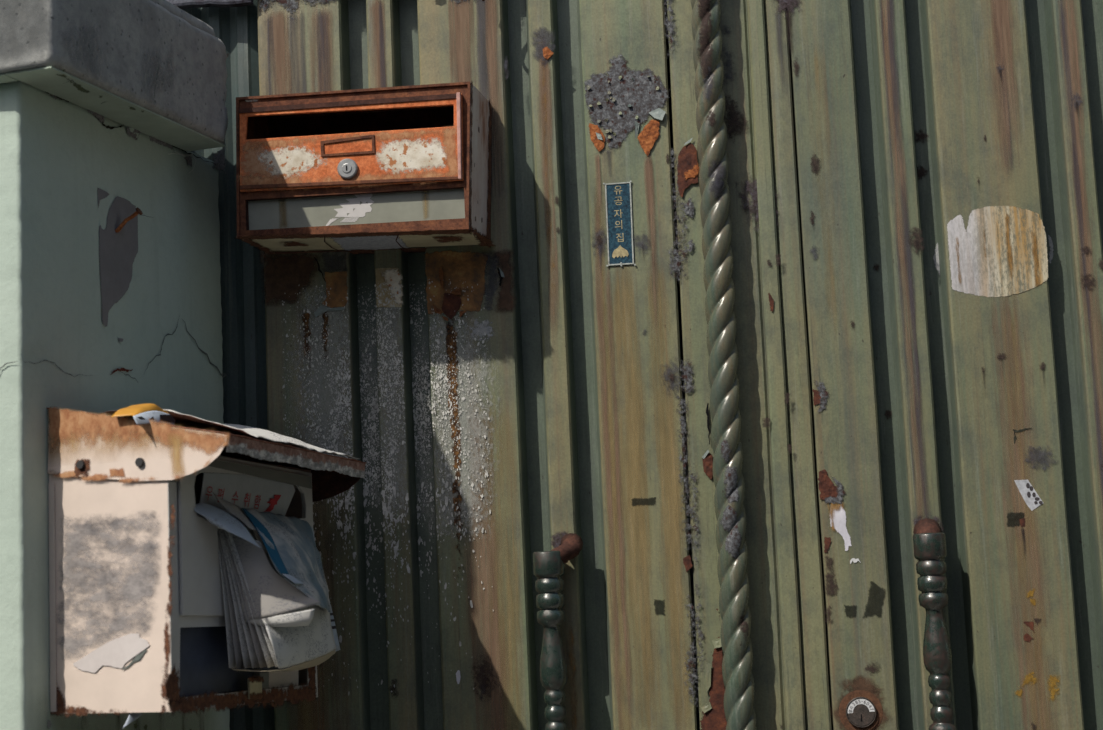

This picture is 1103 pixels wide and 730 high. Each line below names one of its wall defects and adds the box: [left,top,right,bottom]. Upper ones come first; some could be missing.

corrosion [584,54,669,304]
corrosion [666,138,759,229]
crack [0,315,227,382]
corrosion [235,0,515,730]
corrosion [702,403,742,559]
peeling [818,469,861,623]
corrosion [700,637,727,730]